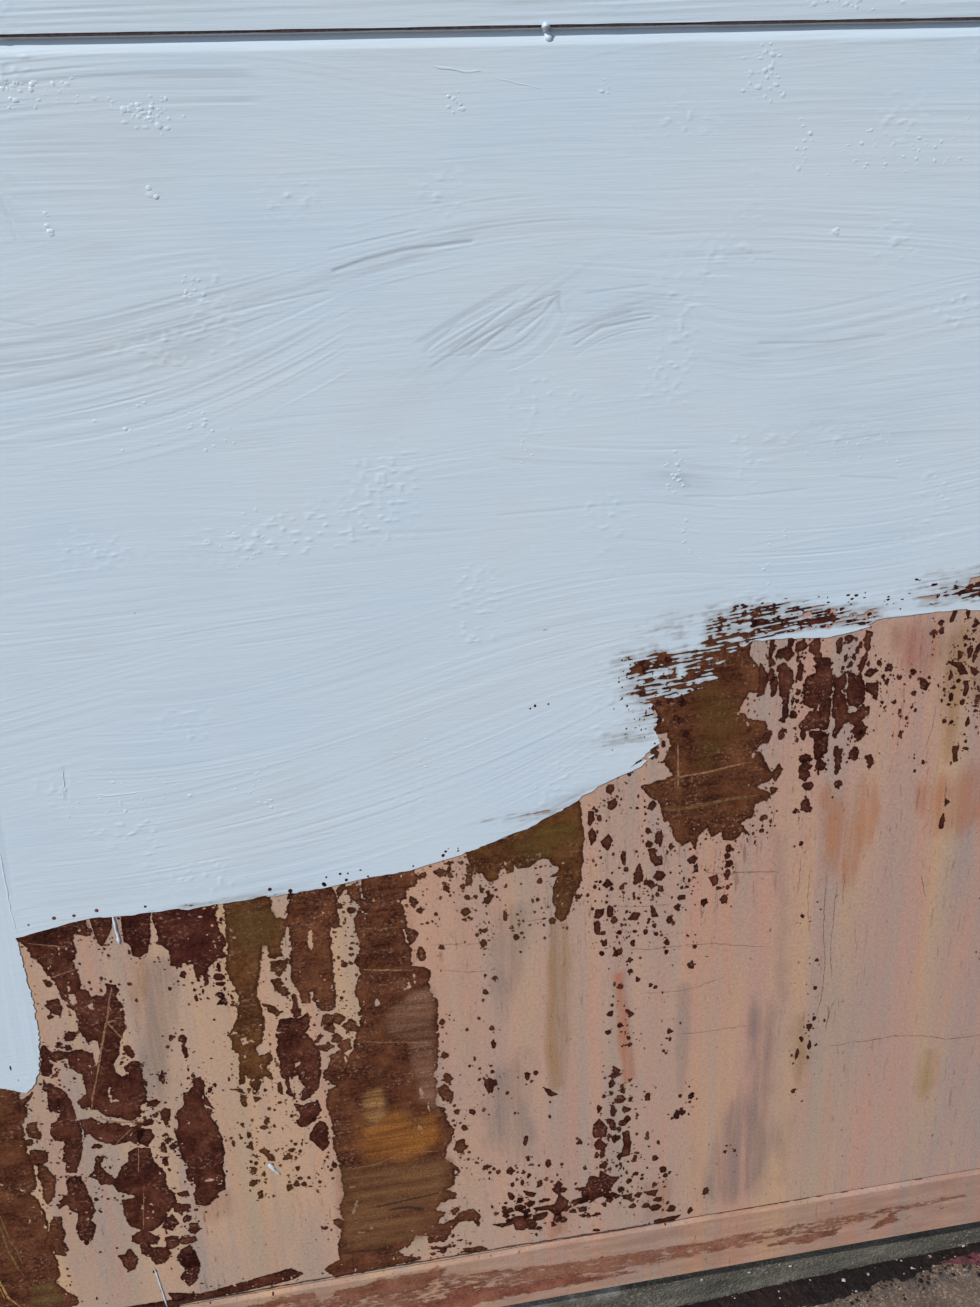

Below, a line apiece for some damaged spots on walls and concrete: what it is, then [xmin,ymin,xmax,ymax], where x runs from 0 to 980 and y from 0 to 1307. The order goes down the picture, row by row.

corrosion [0,578,980,1307]